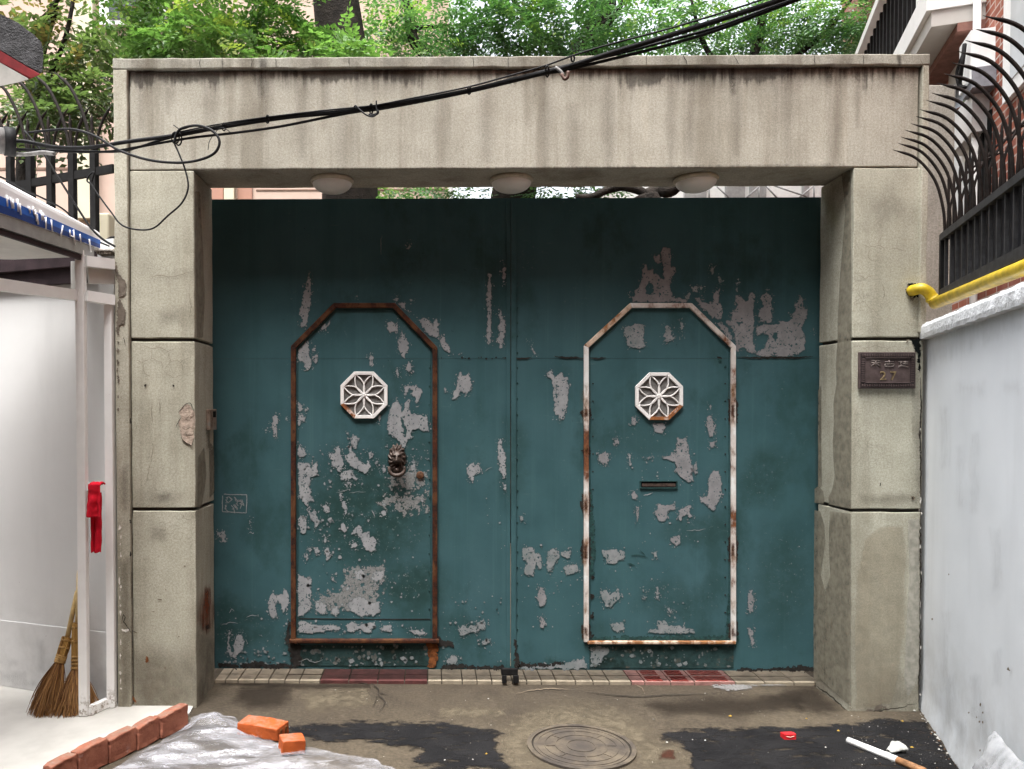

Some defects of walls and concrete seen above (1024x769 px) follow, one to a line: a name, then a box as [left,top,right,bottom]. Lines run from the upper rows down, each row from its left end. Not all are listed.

peeling [296,271,330,371]
peeling [628,247,815,359]
peeling [443,372,474,400]
peeling [544,368,571,421]
peeling [222,295,464,667]
peeling [466,438,506,490]
peeling [442,593,502,665]
peeling [521,544,583,628]
corrosion [580,483,596,579]
peeling [588,422,731,669]
corrosion [581,593,739,647]
corrosion [727,536,739,563]